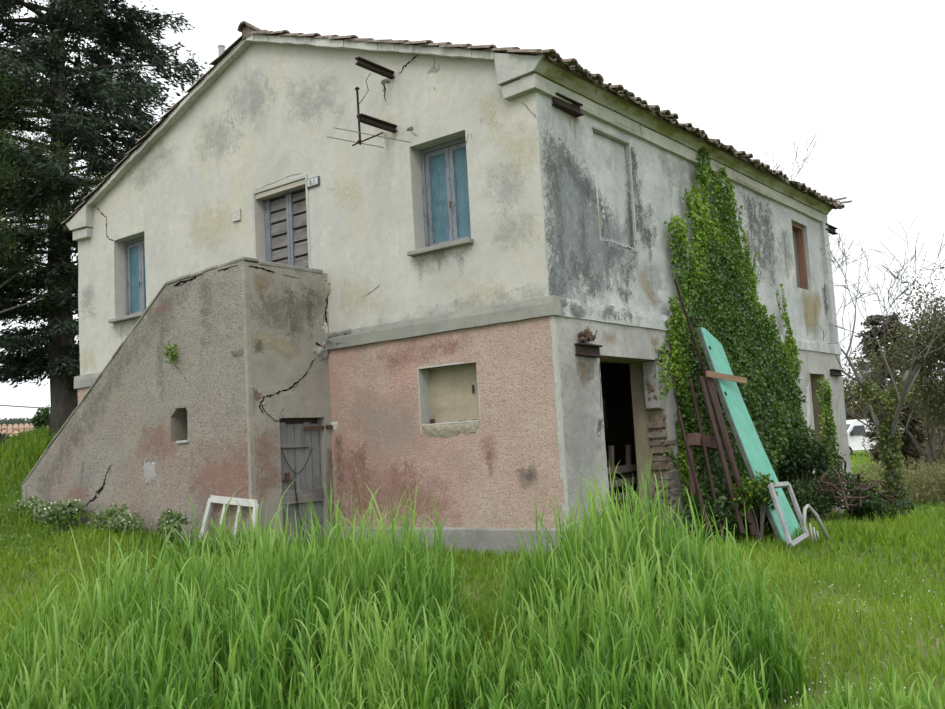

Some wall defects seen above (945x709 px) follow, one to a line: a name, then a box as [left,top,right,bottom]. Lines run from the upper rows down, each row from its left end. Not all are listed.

water stain [541,131,657,320]
water stain [740,193,786,283]
crack [259,297,329,422]
crack [81,461,112,506]